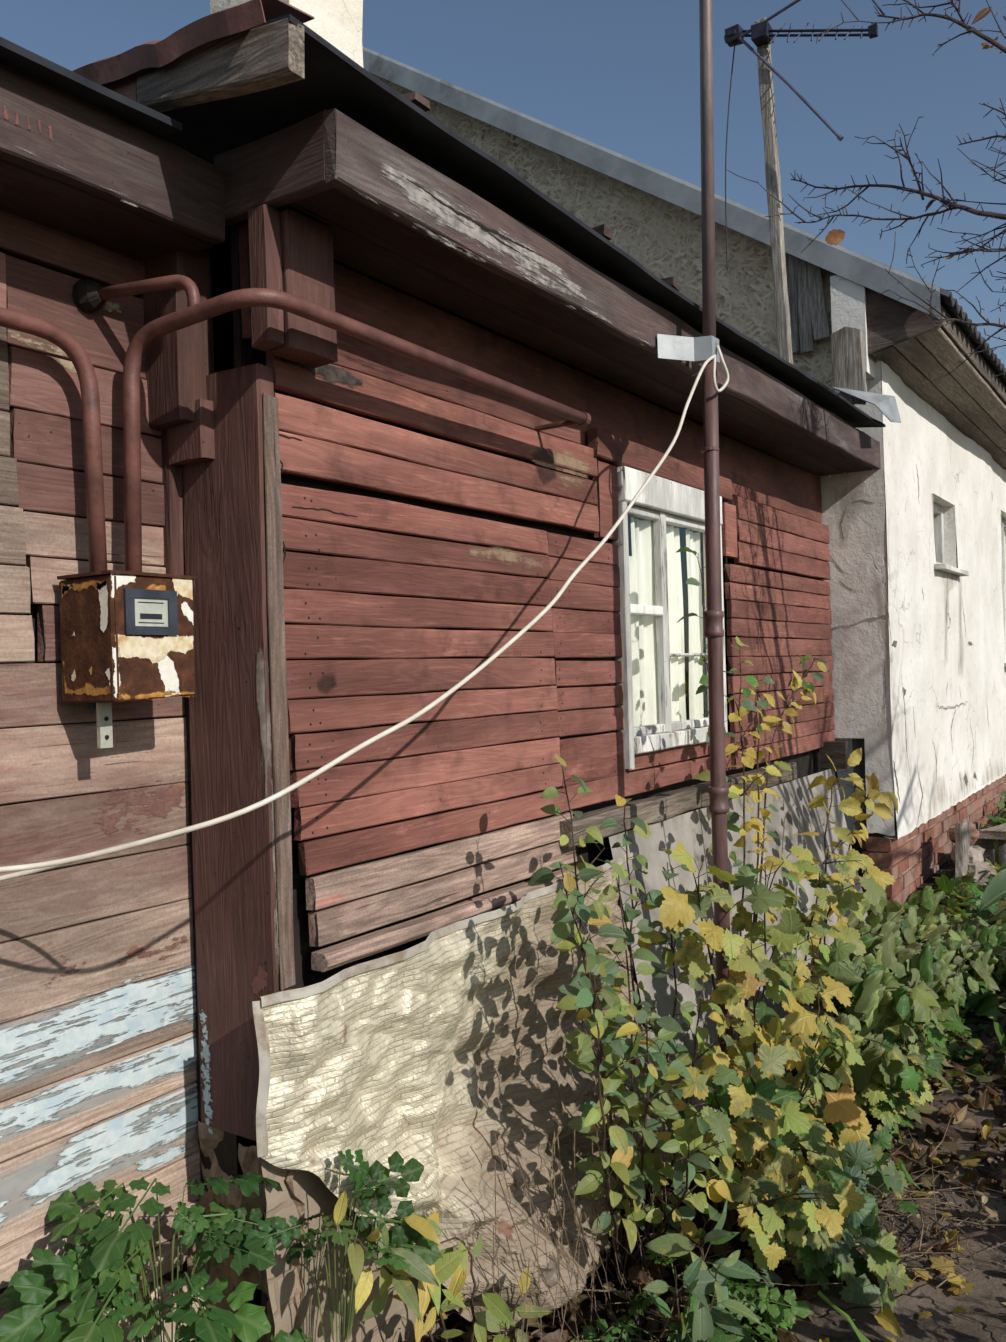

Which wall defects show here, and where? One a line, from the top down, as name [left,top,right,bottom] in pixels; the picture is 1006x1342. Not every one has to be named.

peeling [382,163,610,323]
peeling [0,936,213,1228]